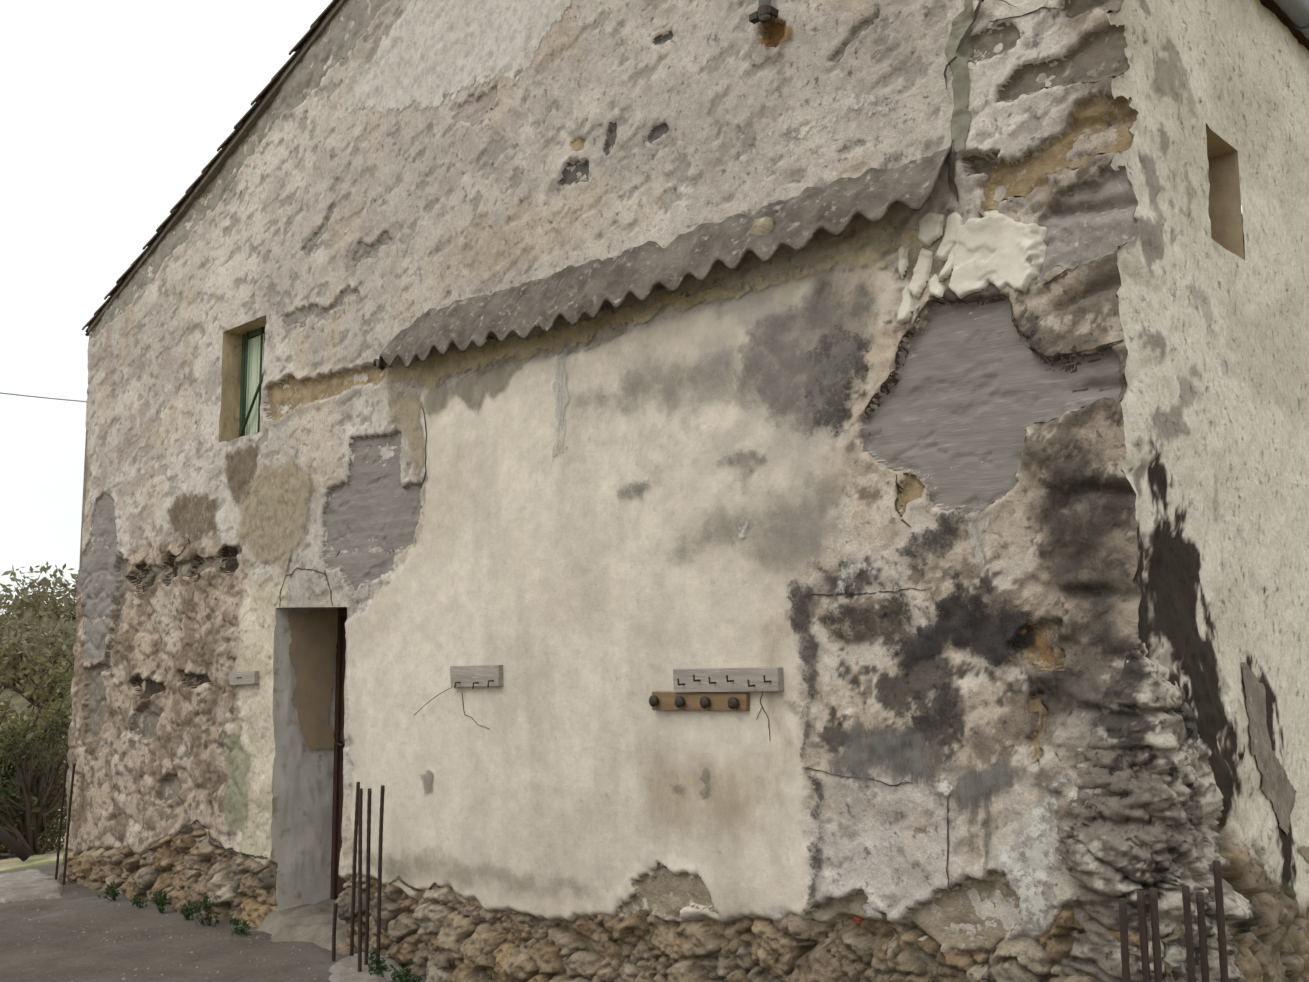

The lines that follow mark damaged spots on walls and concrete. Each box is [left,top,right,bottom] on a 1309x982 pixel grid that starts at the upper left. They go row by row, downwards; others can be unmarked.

crack [943,0,1065,201]
flaking render [897,0,1138,324]
leakage [384,228,924,476]
flaking render [897,473,924,516]
flaking render [84,544,242,750]
leakage [787,435,1129,933]
leakage [1099,754,1136,800]
flaking render [615,863,718,921]